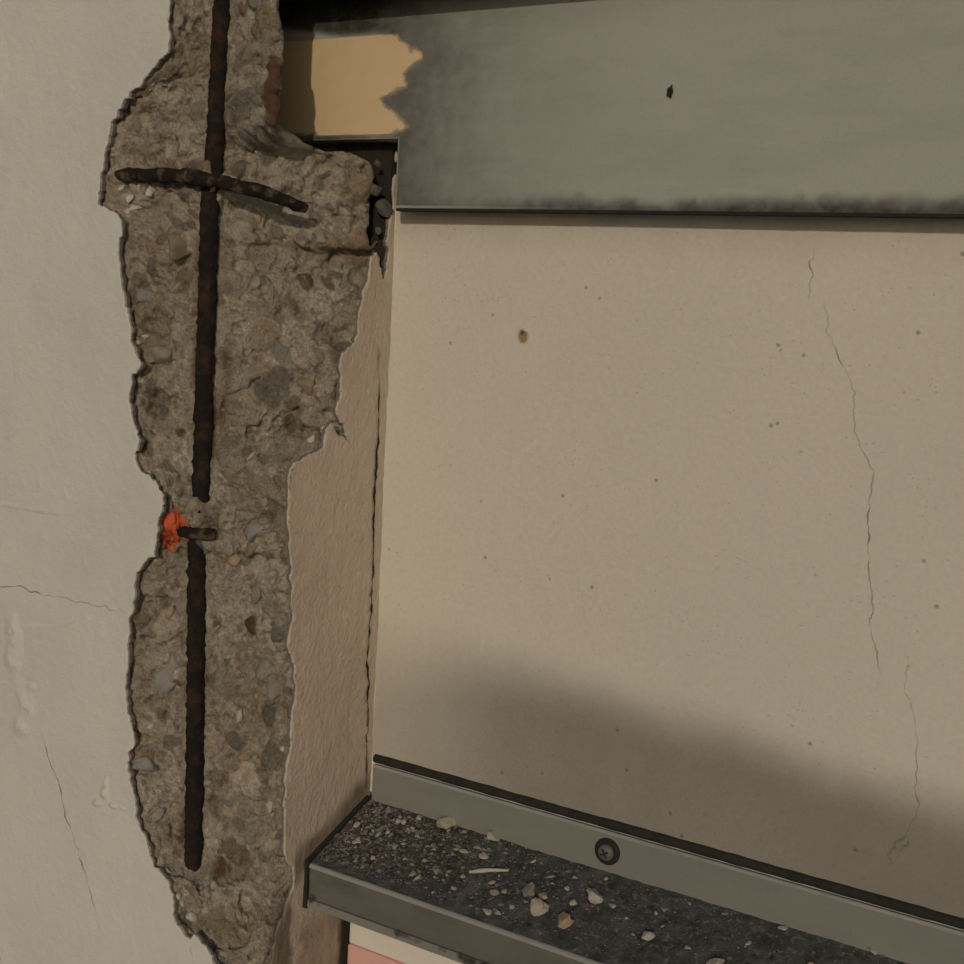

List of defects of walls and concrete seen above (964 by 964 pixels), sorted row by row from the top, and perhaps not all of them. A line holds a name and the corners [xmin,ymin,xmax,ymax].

rust [263,56,280,127]
spalling [101,0,423,964]
rust [159,510,187,552]
rust [244,617,255,635]